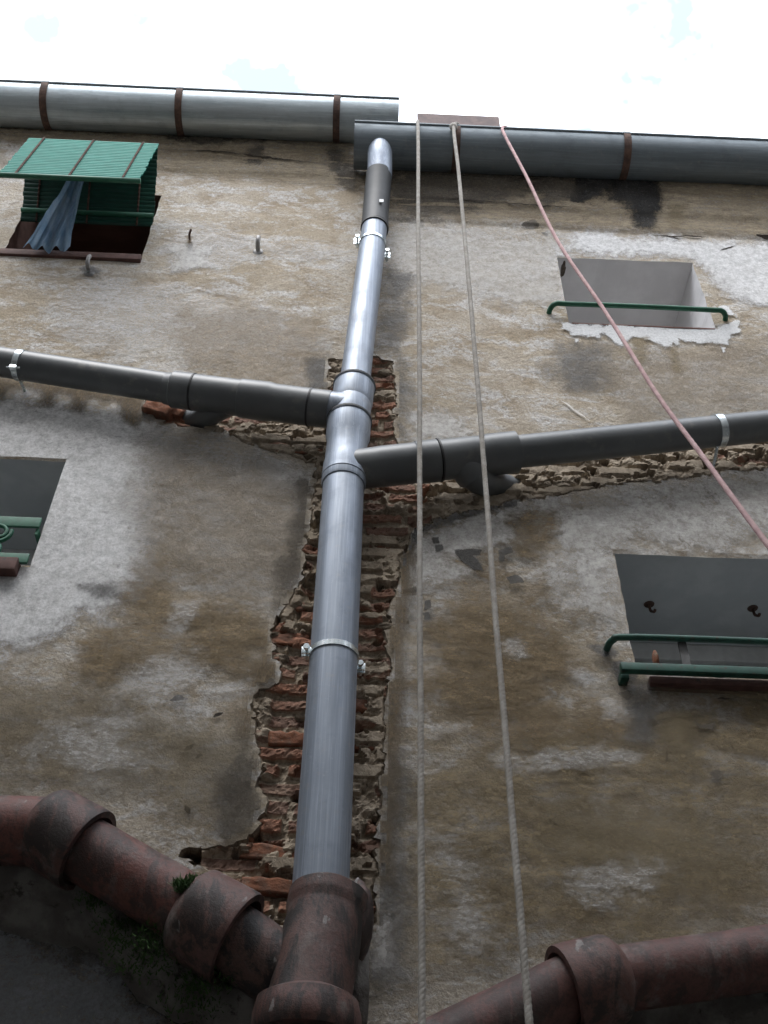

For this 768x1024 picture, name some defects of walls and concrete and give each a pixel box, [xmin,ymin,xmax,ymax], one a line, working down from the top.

damp [389,170,768,236]
peeling [561,305,741,353]
damp [0,377,143,426]
spalling [327,360,343,391]
spalling [367,358,397,448]
damp [0,441,313,829]
spalling [141,400,327,925]
spalling [350,442,768,924]
damp [369,548,768,982]